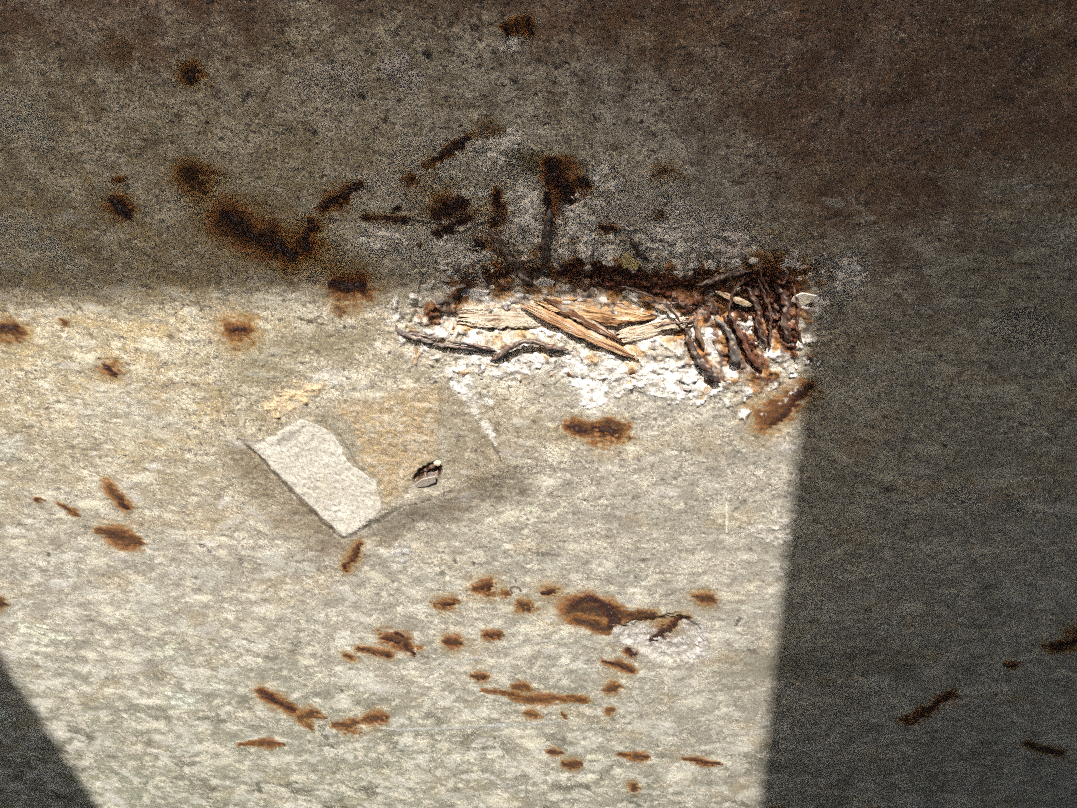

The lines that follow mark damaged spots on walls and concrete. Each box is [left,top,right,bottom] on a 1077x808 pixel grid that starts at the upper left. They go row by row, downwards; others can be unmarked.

corrosion [170,123,508,318]
leakage [357,127,753,274]
corrosion [539,155,593,265]
spalling [380,214,833,422]
leakage [812,253,872,316]
leakage [445,345,732,446]
corrosion [554,416,635,449]
corrosion [714,316,825,435]
corrosion [92,478,147,552]
corrosion [470,577,692,645]
corrosion [254,686,390,736]
corrosion [469,671,591,720]